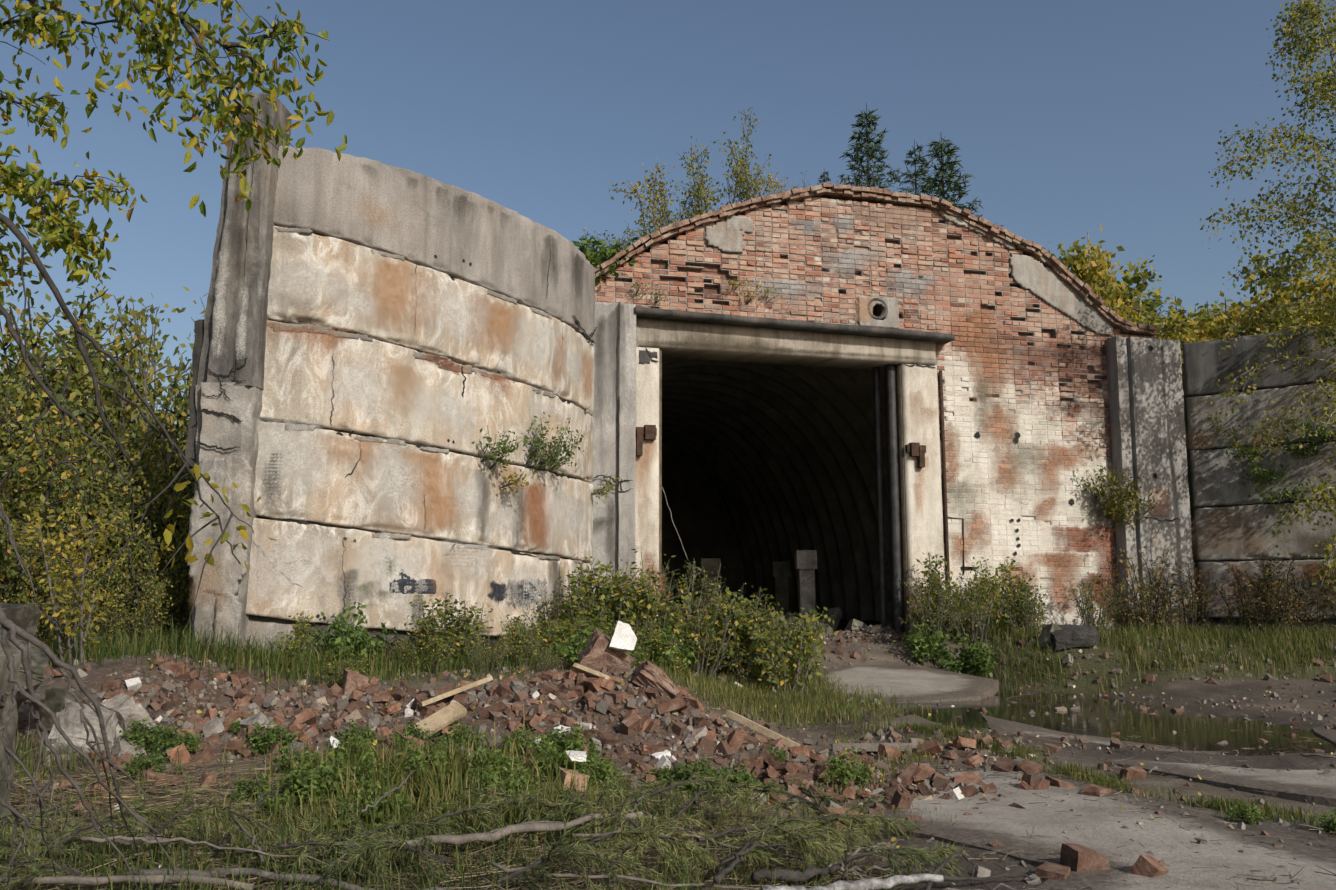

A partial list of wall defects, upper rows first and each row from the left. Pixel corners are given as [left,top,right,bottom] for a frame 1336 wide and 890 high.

flaking render [937,209,1113,355]
crack [194,357,248,451]
crack [324,253,521,478]
rust [427,354,460,373]
crack [546,252,597,415]
peeling [956,311,1017,488]
spalling [1058,368,1112,454]
peeling [946,432,958,486]
peeling [1036,444,1084,515]
peeling [955,515,985,557]
peeling [1008,567,1033,590]
peeling [1041,522,1119,621]